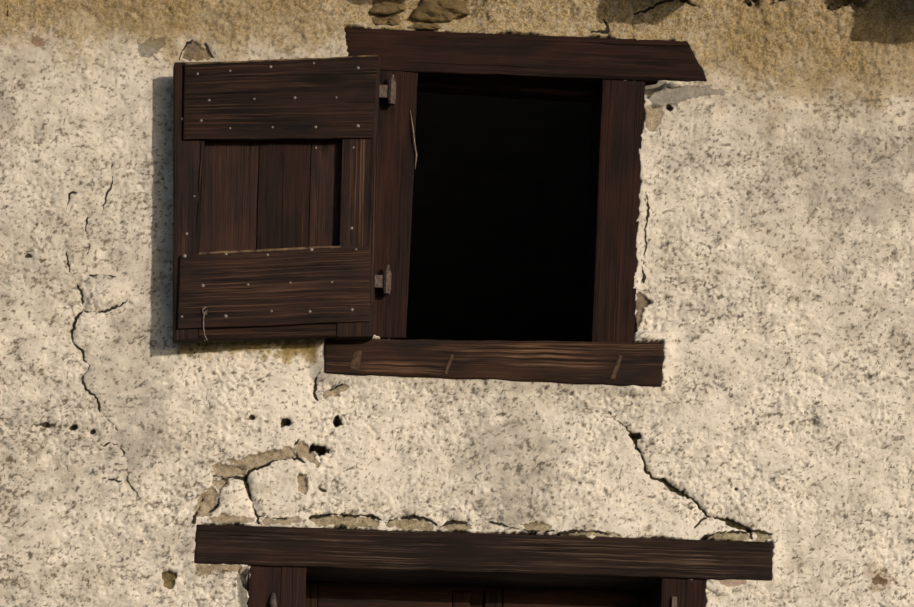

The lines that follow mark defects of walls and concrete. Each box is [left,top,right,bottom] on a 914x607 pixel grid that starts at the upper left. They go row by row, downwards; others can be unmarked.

crack [633,0,699,15]
flaking render [643,85,727,132]
crack [66,164,139,497]
crack [608,411,773,540]
flaking render [194,441,471,533]
crack [309,513,467,527]
flaking render [521,522,552,535]
crack [489,521,620,536]
flaking render [700,531,772,542]